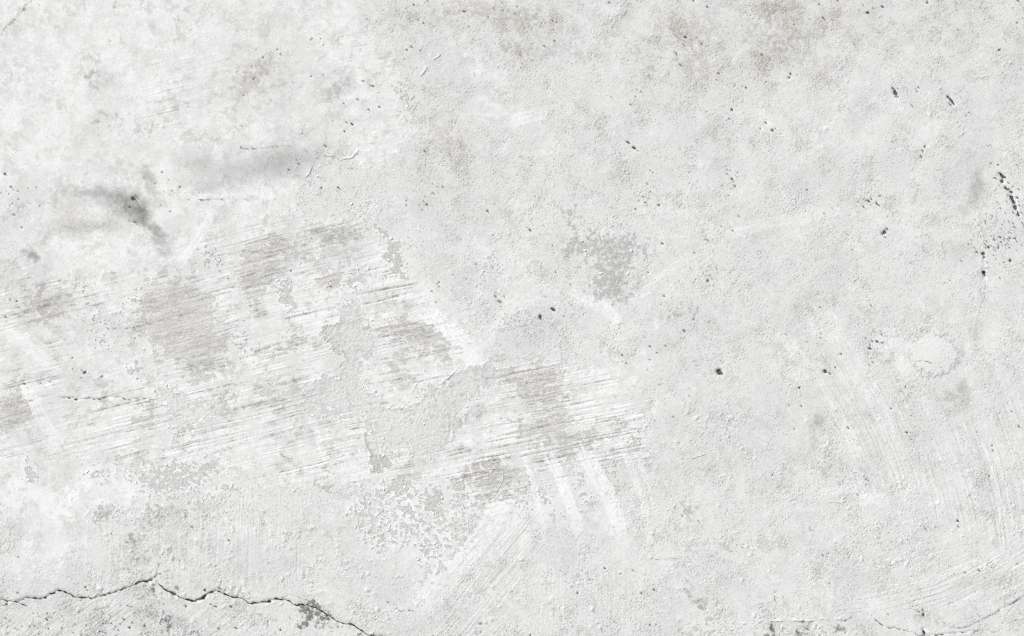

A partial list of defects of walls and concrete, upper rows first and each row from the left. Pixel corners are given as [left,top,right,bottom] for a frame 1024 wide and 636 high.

crack [1,564,385,636]